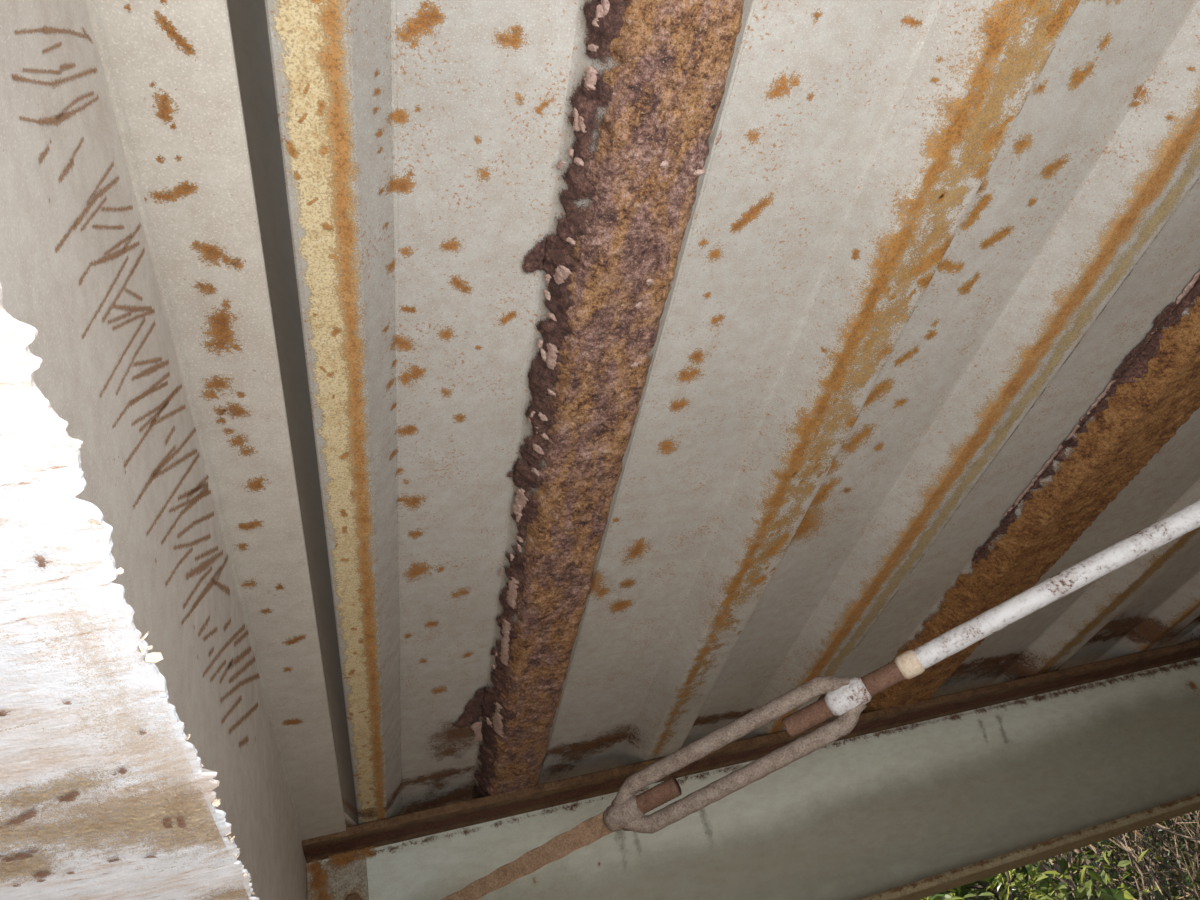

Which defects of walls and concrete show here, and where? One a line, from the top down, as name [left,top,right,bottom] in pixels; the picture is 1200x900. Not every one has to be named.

rust [154,0,196,57]
peeling [592,0,610,27]
peeling [584,43,599,91]
peeling [572,107,587,133]
peeling [543,265,572,321]
rust [199,374,258,456]
peeling [527,411,549,476]
peeling [537,339,559,370]
rust [298,0,1130,900]
rust [791,84,1200,688]
rust [823,528,1200,748]
rust [0,588,240,883]